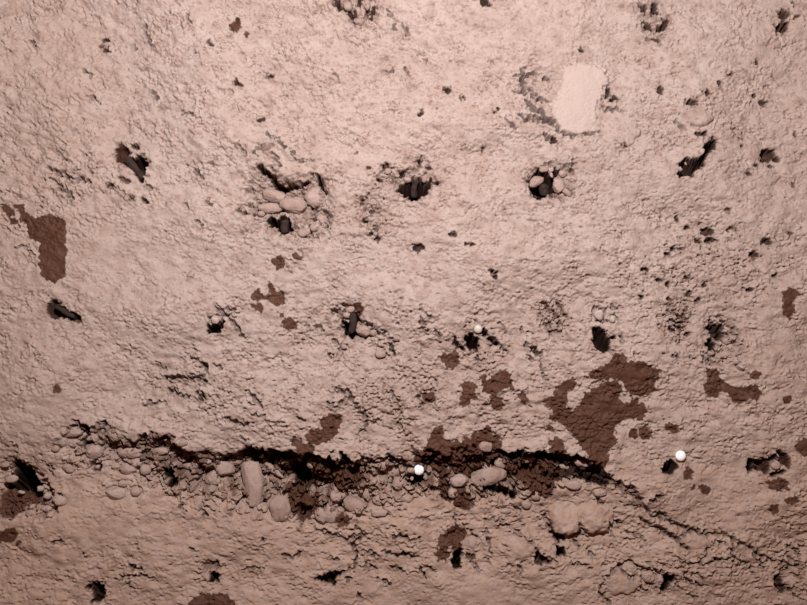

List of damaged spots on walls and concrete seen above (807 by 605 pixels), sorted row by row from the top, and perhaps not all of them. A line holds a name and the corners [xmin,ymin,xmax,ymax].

hole [108,141,153,204]
spalling [234,163,335,245]
hole [366,154,441,203]
hole [521,158,578,204]
hole [673,118,721,182]
crack [113,543,156,590]
crack [241,564,265,572]
crack [281,550,303,562]
spalling [0,419,664,580]
crack [313,515,437,599]
crack [483,506,539,547]
crack [596,493,807,575]